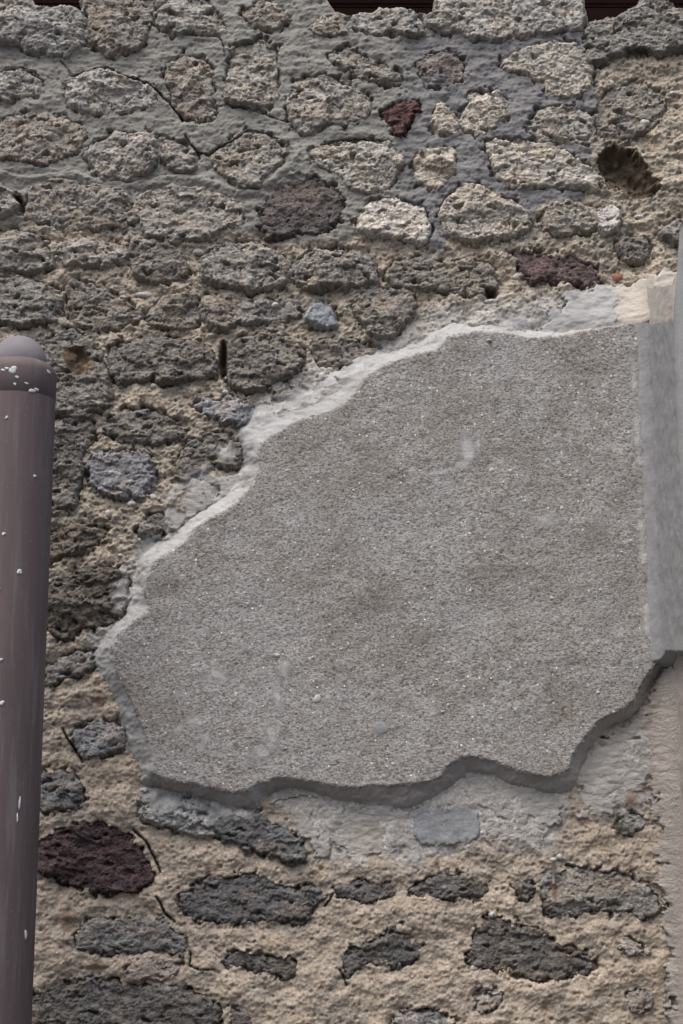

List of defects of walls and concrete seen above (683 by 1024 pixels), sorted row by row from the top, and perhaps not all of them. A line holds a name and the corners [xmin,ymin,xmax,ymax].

crack [61,61,284,157]
hole [597,145,661,200]
flaking render [271,788,415,862]
flaking render [467,773,564,850]